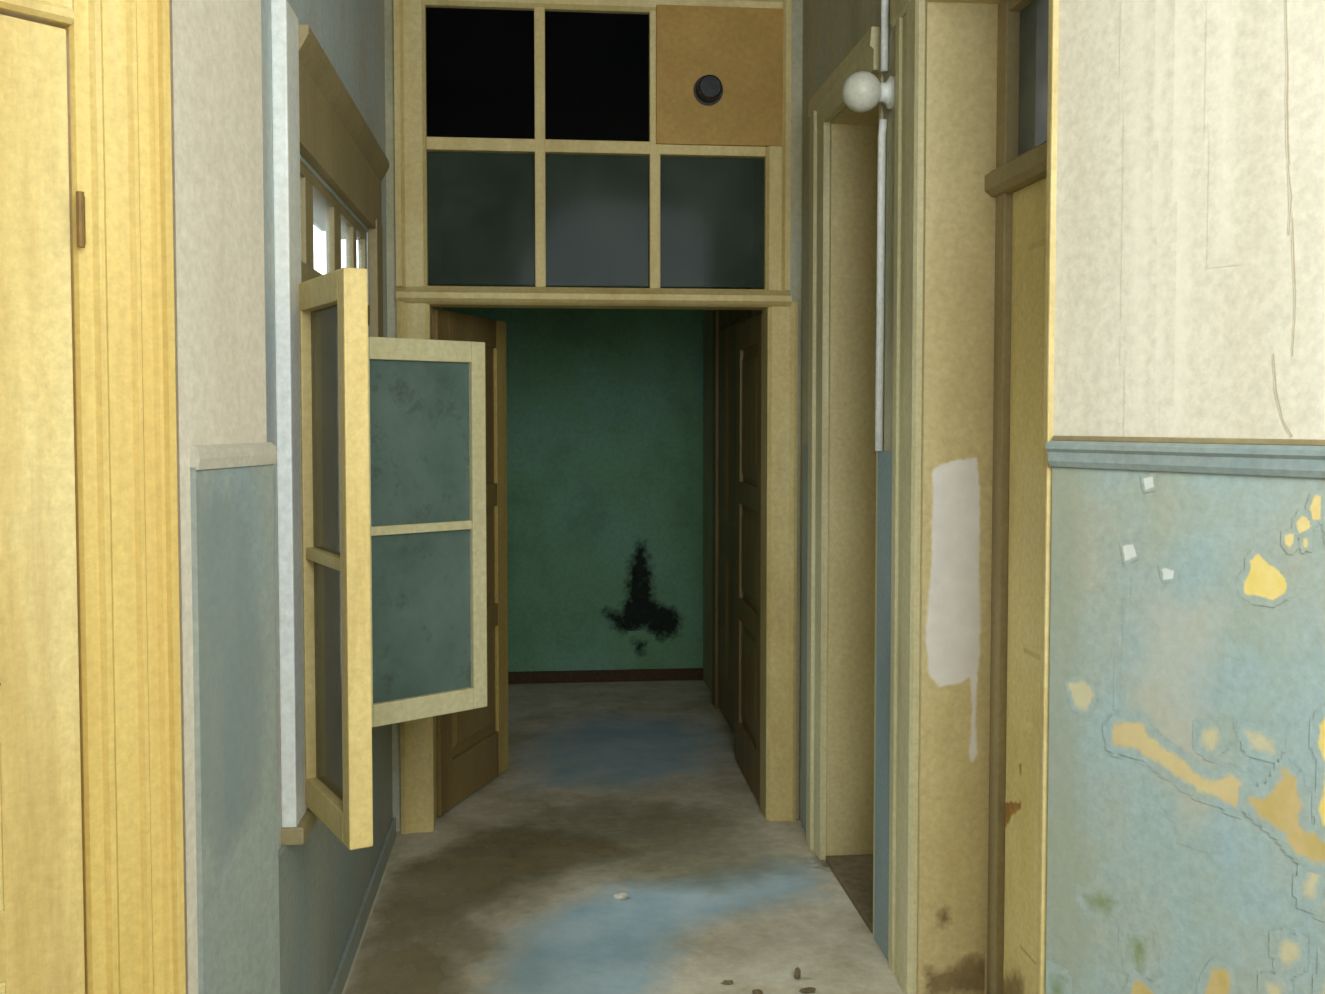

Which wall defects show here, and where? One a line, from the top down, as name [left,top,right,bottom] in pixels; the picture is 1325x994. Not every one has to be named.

peeling [1141,473,1157,493]
peeling [1120,540,1139,564]
peeling [1236,490,1325,607]
peeling [1159,565,1177,584]
peeling [1065,674,1325,914]
peeling [1197,956,1239,994]